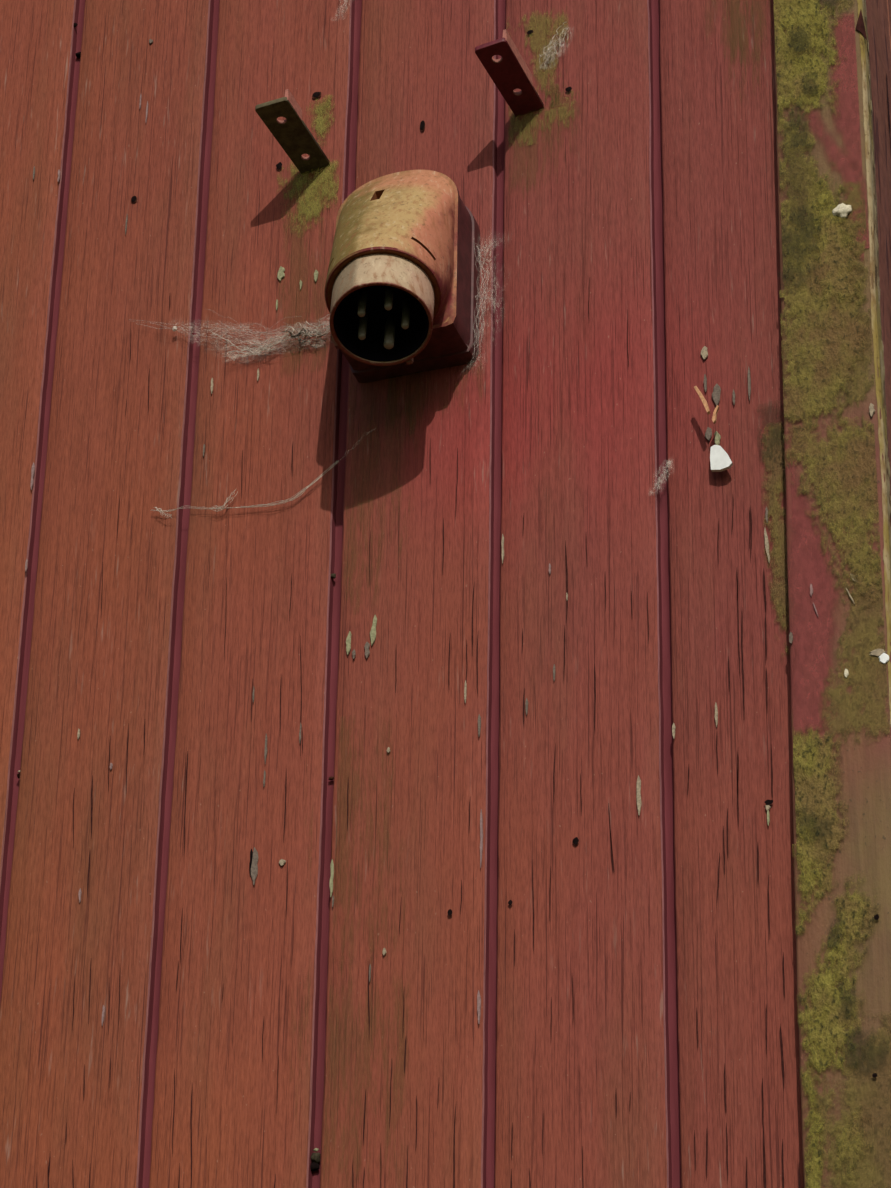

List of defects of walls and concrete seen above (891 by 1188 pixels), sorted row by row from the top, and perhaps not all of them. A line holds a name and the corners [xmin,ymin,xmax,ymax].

peeling [346,615,377,659]
peeling [249,847,259,885]